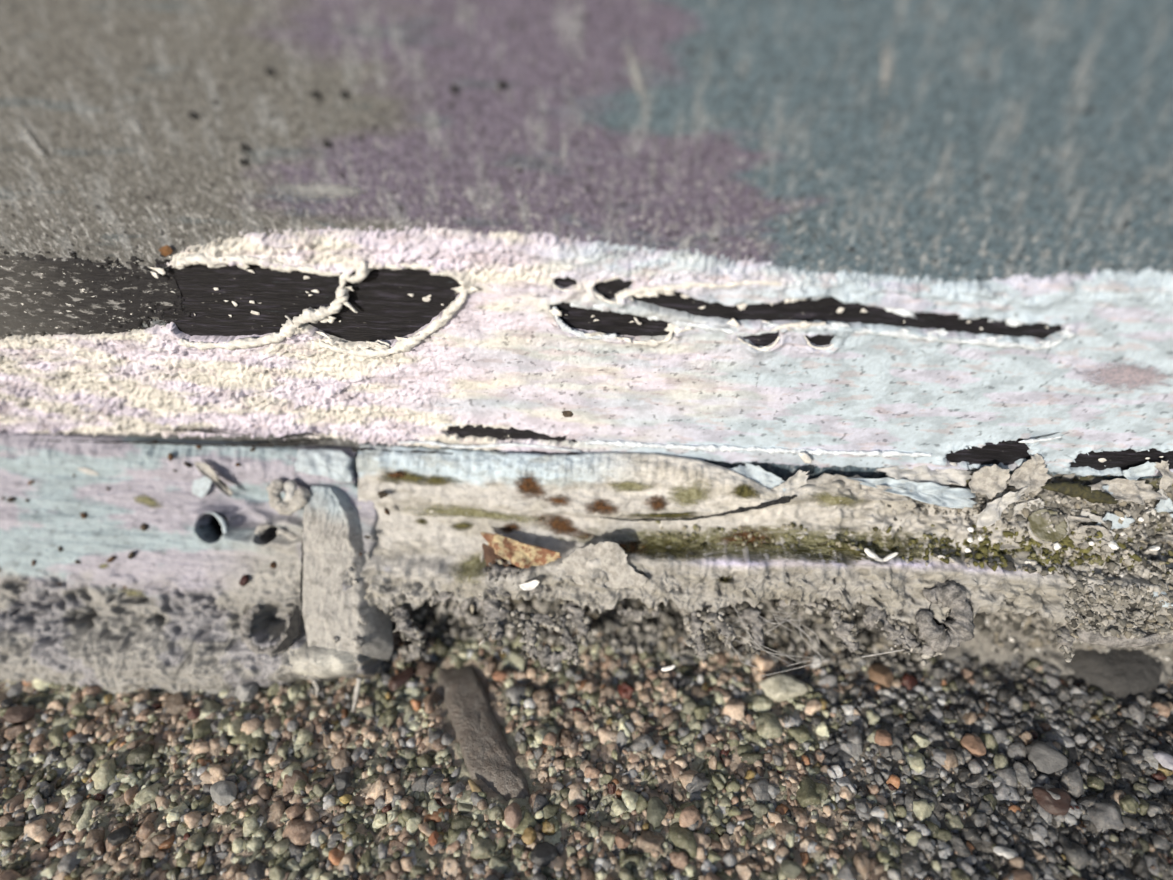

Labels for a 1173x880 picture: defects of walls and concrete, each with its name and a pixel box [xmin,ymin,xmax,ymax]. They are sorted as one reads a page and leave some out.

peeling [0,246,480,358]
peeling [549,277,1079,356]
peeling [446,424,577,443]
peeling [728,438,1053,528]
peeling [480,532,561,590]
peeling [1000,542,1021,550]